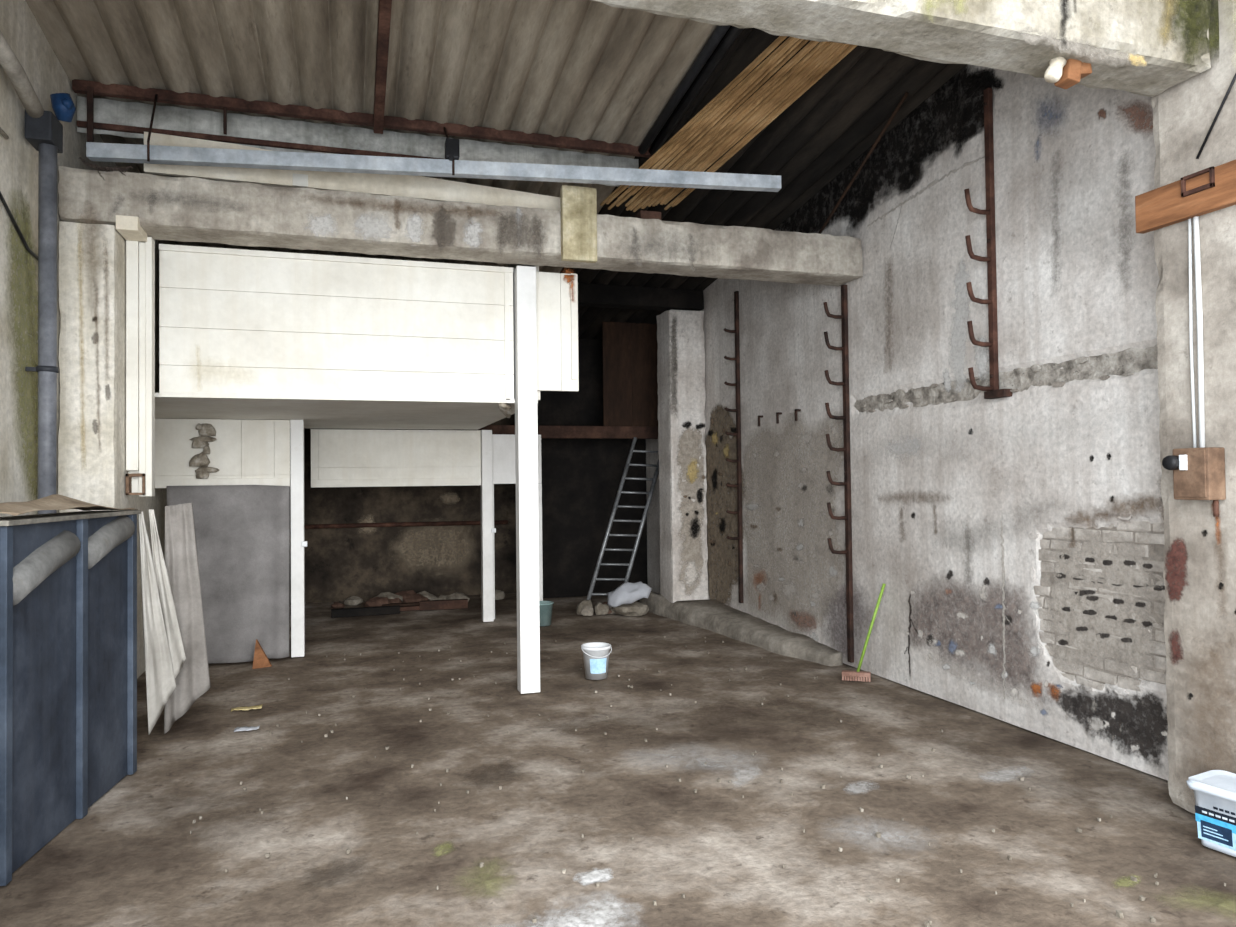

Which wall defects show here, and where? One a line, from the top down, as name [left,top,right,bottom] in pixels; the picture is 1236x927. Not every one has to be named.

spalling [854,262,1158,413]
spalling [906,515,1188,697]
water stain [1052,685,1168,765]